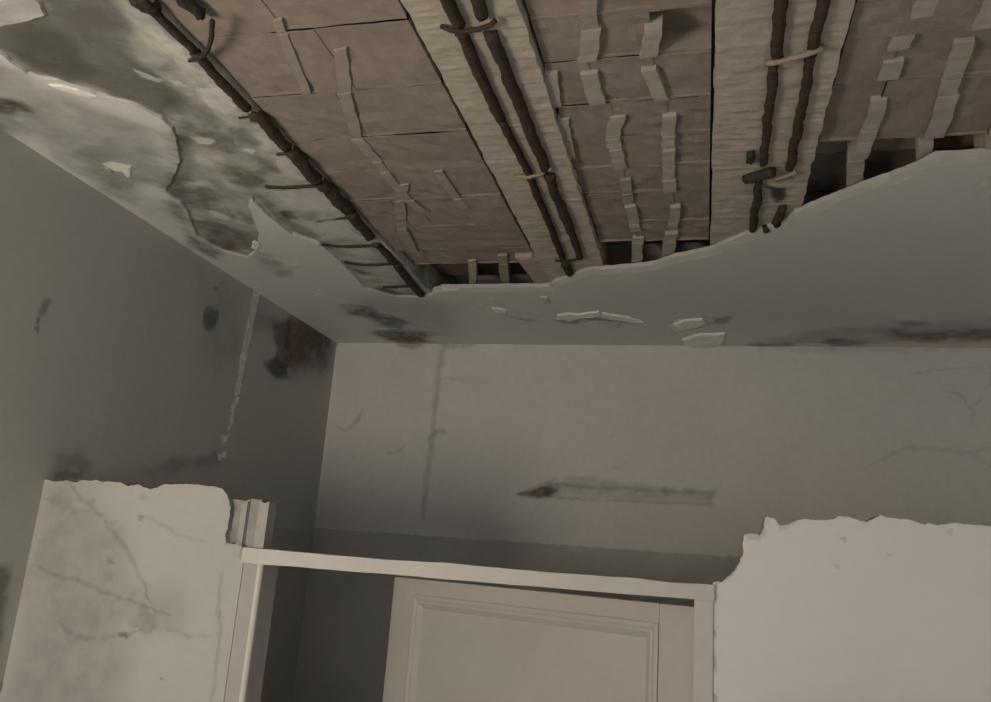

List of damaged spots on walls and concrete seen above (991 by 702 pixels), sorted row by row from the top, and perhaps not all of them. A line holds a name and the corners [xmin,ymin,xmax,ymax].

water stain [0,99,29,113]
flaking render [0,0,991,305]
flaking render [557,311,644,328]